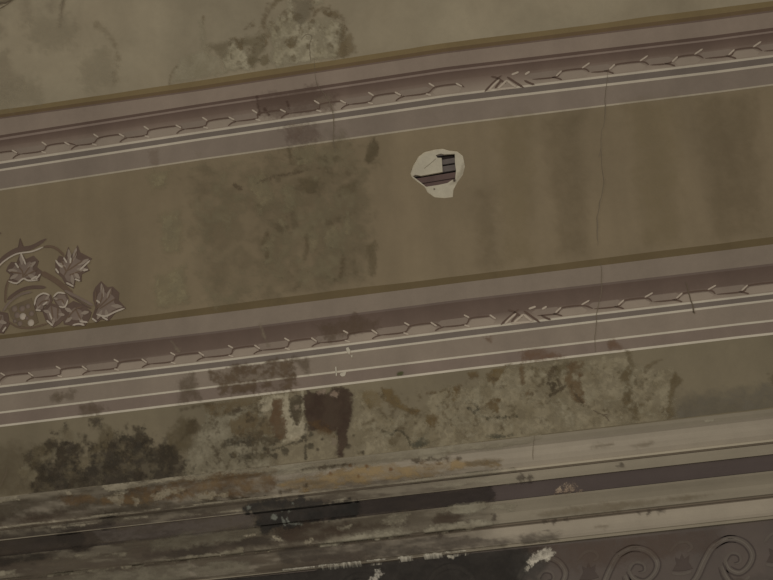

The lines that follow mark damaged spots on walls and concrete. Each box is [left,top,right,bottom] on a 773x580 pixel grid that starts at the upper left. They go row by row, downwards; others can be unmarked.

flaking render [410,148,465,198]
water stain [18,359,500,545]
peeling [248,390,529,474]
peeling [80,470,235,526]
peeling [304,514,408,547]
peeling [425,499,515,537]
peeling [283,559,385,580]